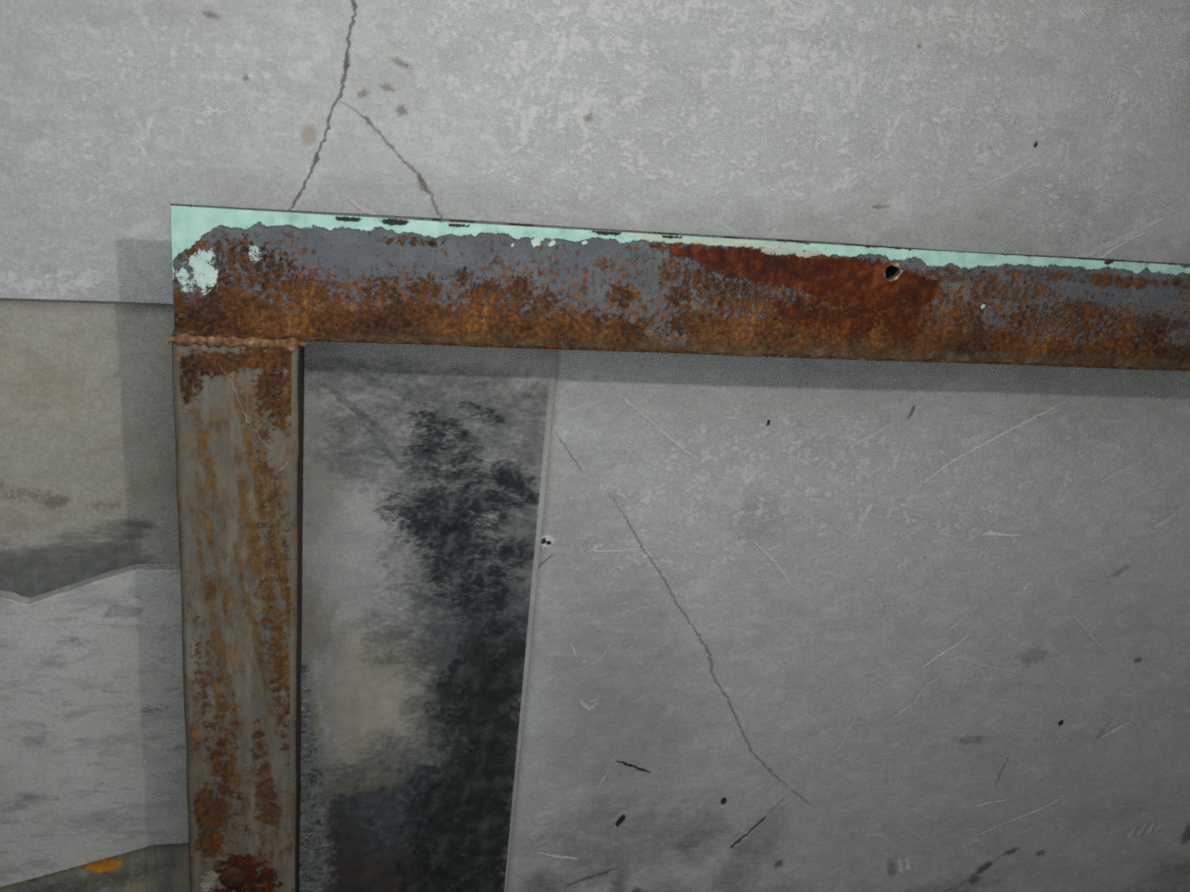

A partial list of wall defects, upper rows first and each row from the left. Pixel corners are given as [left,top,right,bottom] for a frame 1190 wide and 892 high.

crack [289,0,357,210]
peeling [170,206,1190,295]
leakage [316,392,540,892]
corrosion [173,227,1190,892]
corrosion [81,859,123,873]